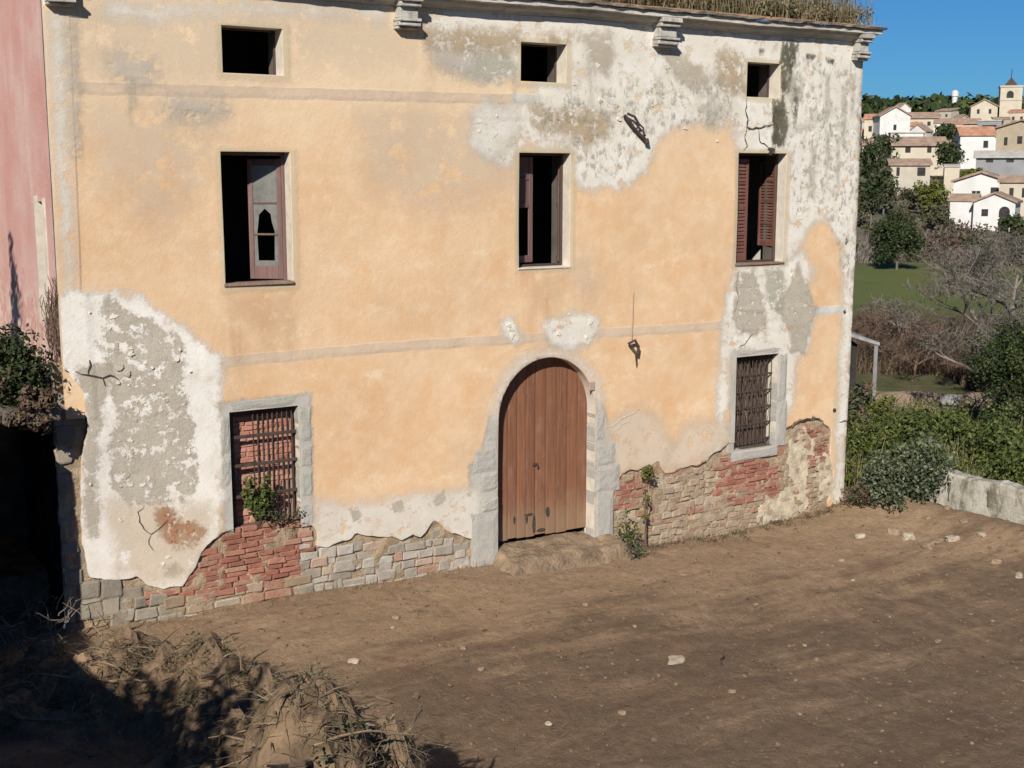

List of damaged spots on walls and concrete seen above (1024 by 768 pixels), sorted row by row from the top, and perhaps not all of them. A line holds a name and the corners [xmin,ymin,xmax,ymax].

crack [744,99,774,150]
peeling [424,8,863,548]
flaking render [50,14,483,631]
crack [75,360,119,386]
crack [137,506,168,551]
corrosion [155,507,206,548]